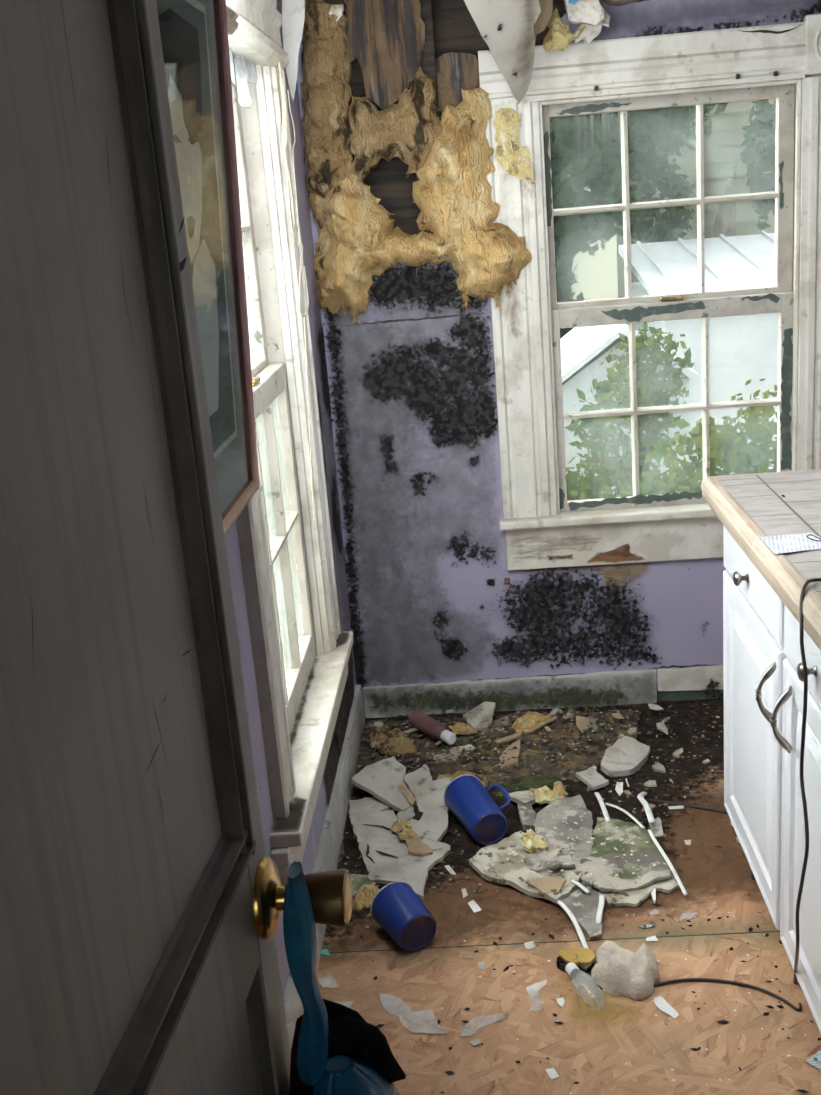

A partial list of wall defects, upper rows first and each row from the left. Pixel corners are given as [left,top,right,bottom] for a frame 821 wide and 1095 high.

flaking render [534,0,610,44]
leakage [610,0,821,37]
peeling [282,0,305,101]
peeling [557,102,632,115]
peeling [543,131,552,227]
peeling [601,301,706,322]
peeling [739,293,780,303]
peeling [780,328,793,470]
peeling [559,488,702,511]
leakage [316,262,662,807]